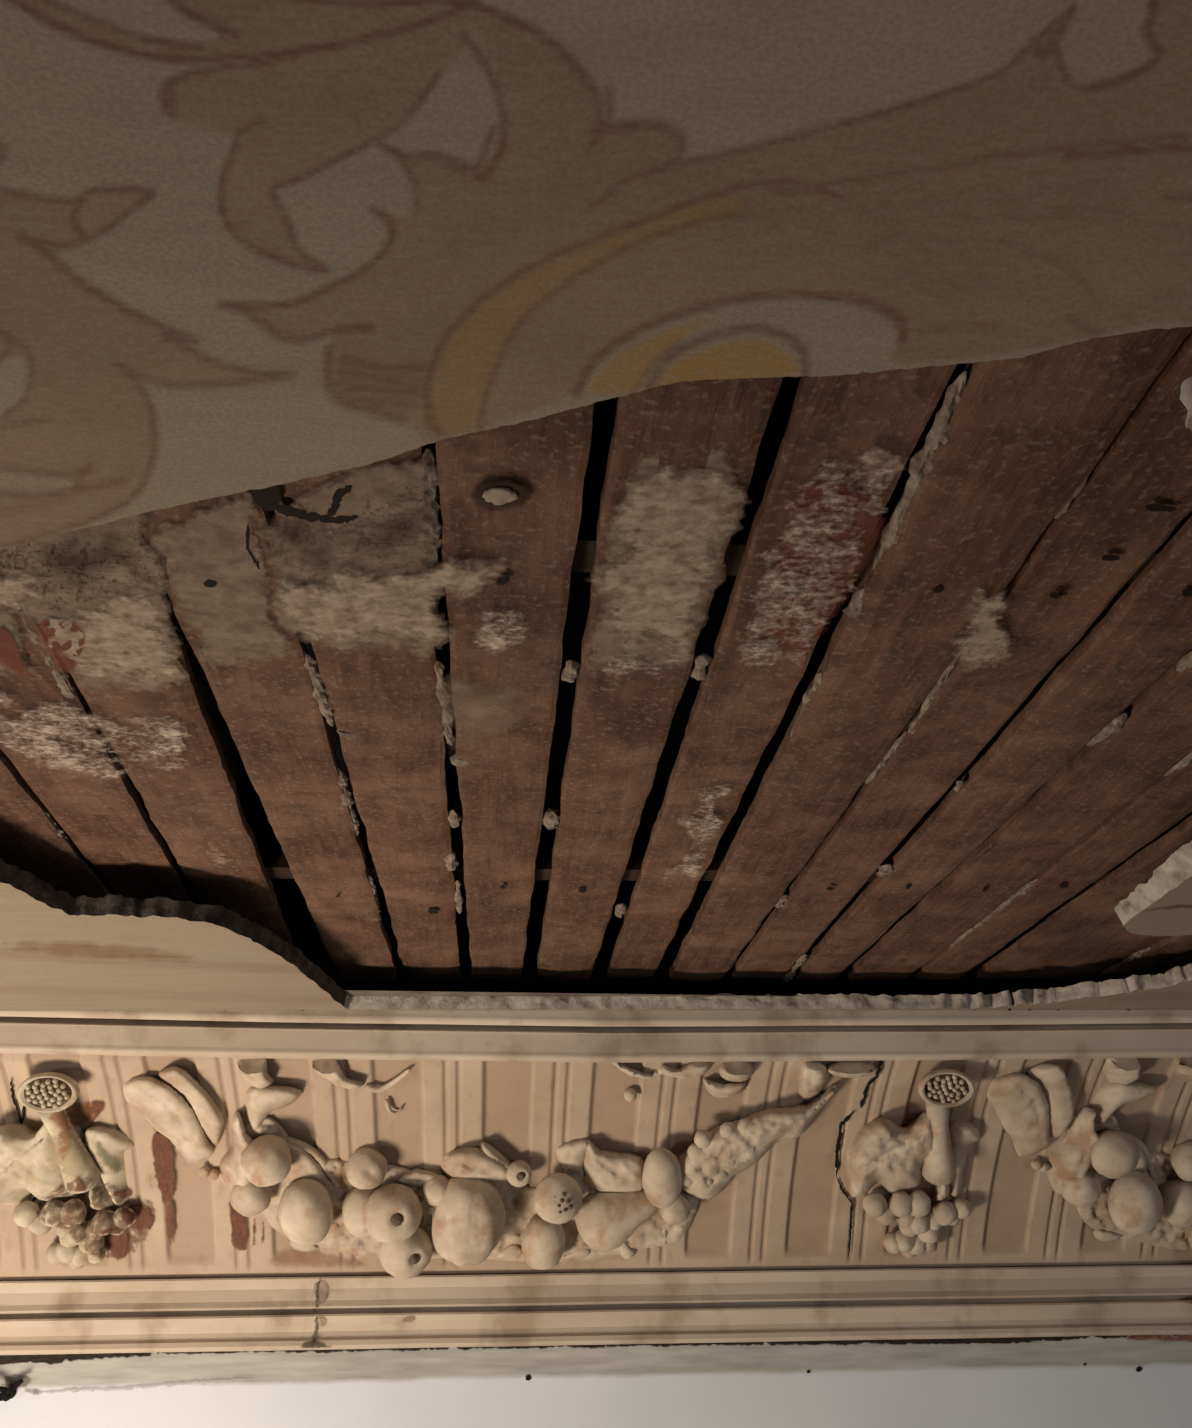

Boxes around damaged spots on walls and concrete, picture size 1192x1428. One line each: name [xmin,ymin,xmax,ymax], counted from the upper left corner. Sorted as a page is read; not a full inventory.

flaking render [1180,376,1192,428]
peeling [39,619,84,672]
flaking render [1115,841,1192,926]
flaking render [0,857,1192,1009]
crack [835,1061,883,1257]